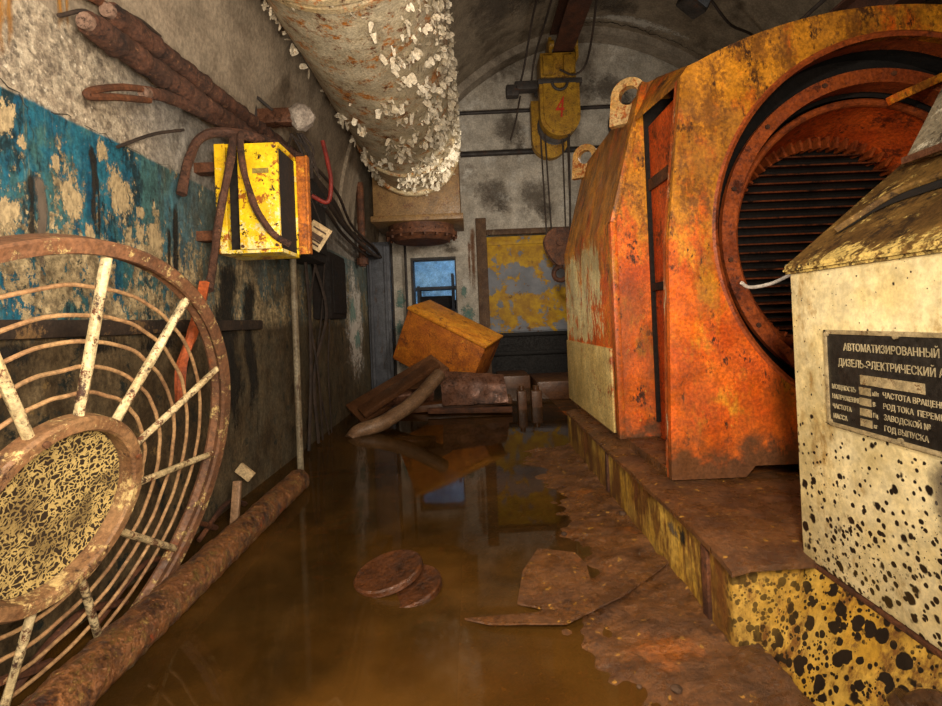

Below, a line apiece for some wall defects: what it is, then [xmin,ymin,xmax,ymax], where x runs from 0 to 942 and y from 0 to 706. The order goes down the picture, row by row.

corrosion [0,0,12,40]
peeling [0,100,27,150]
peeling [0,195,25,236]
peeling [49,153,96,238]
peeling [97,136,174,268]